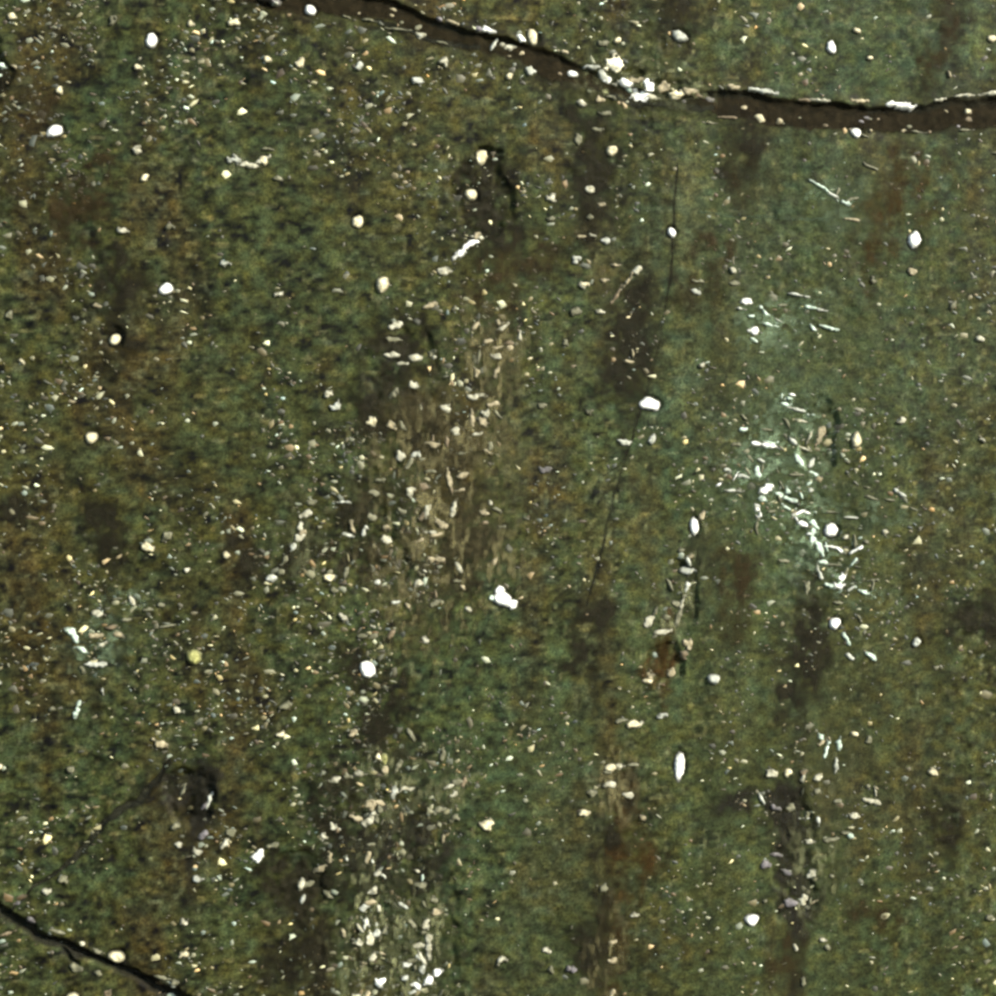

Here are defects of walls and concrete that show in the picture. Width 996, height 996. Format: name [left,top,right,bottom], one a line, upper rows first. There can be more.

crack [241,0,996,134]
crack [0,764,186,996]